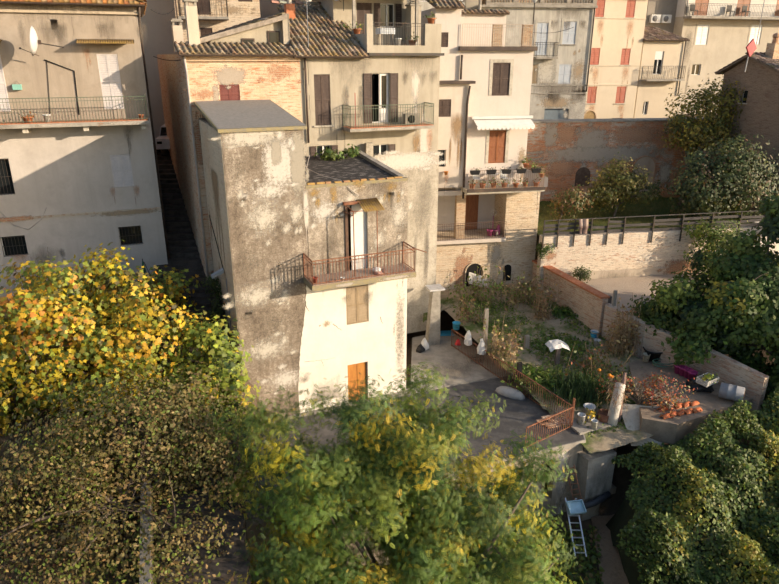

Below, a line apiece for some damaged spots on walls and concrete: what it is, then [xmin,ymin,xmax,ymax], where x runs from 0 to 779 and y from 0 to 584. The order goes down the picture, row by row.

water stain [449,117,462,164]
peeling [194,112,359,246]
peeling [222,276,290,309]